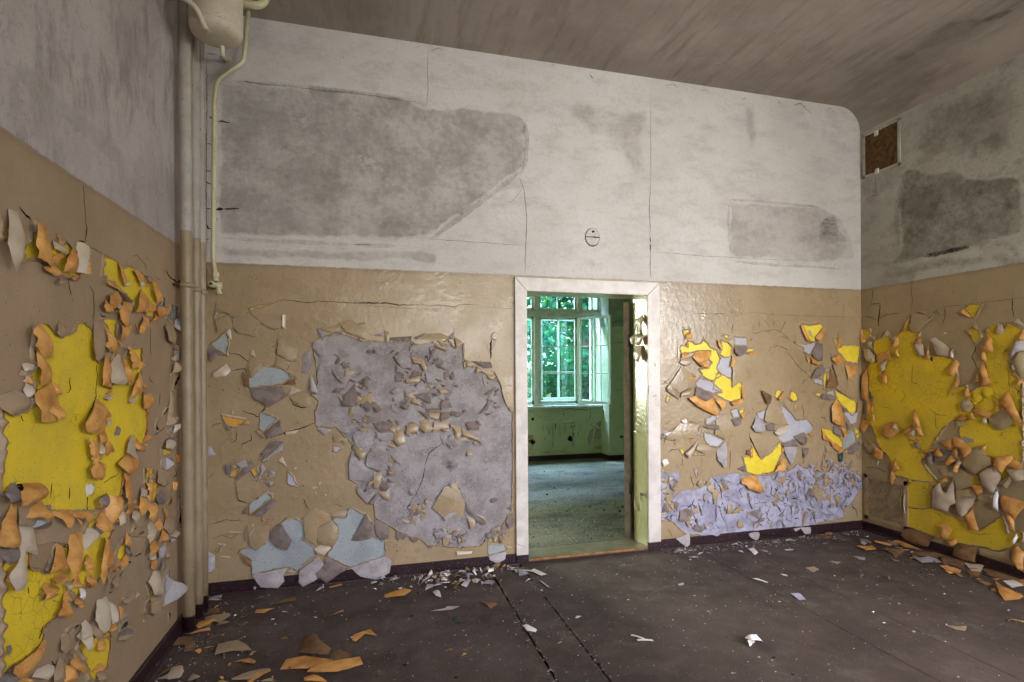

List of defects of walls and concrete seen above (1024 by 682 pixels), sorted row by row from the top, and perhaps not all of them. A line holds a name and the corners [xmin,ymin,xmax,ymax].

peeling [0,208,188,682]
peeling [207,301,546,604]
crack [274,300,514,310]
crack [439,185,527,262]
peeling [660,298,1024,588]